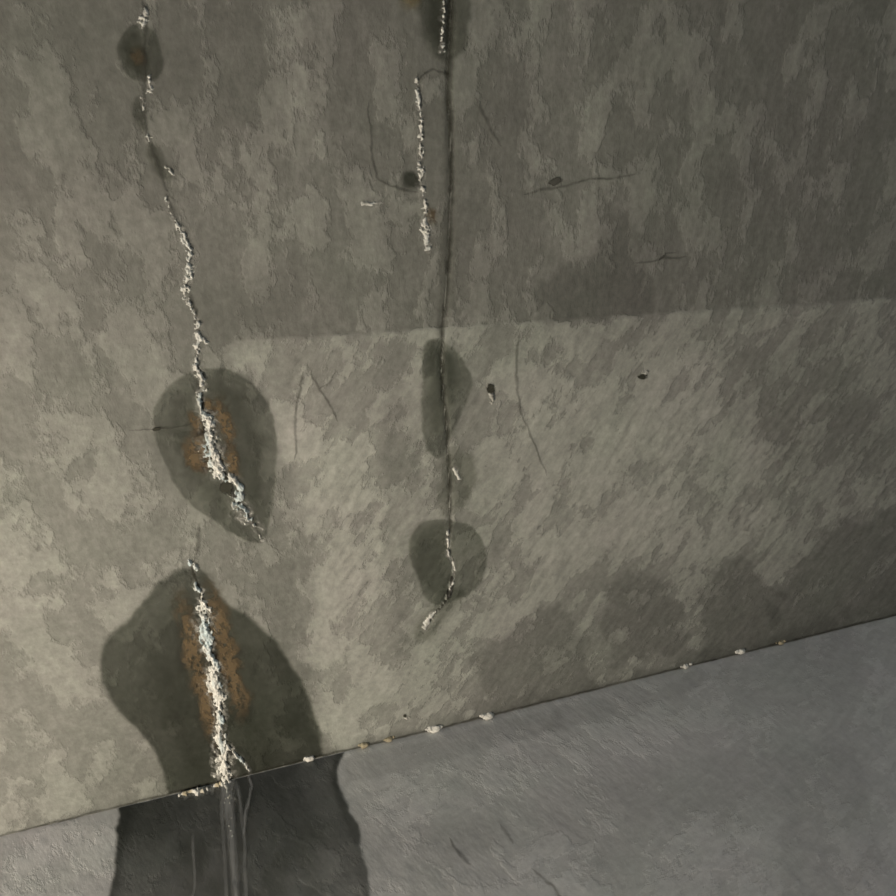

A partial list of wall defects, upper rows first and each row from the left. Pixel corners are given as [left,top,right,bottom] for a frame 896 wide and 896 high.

water stain [137,7,149,29]
crack [445,2,453,201]
crack [441,236,450,398]
corrosion [184,399,238,476]
water stain [446,529,456,591]
corrosion [181,609,218,734]
corrosion [207,596,249,707]
water stain [111,558,362,896]